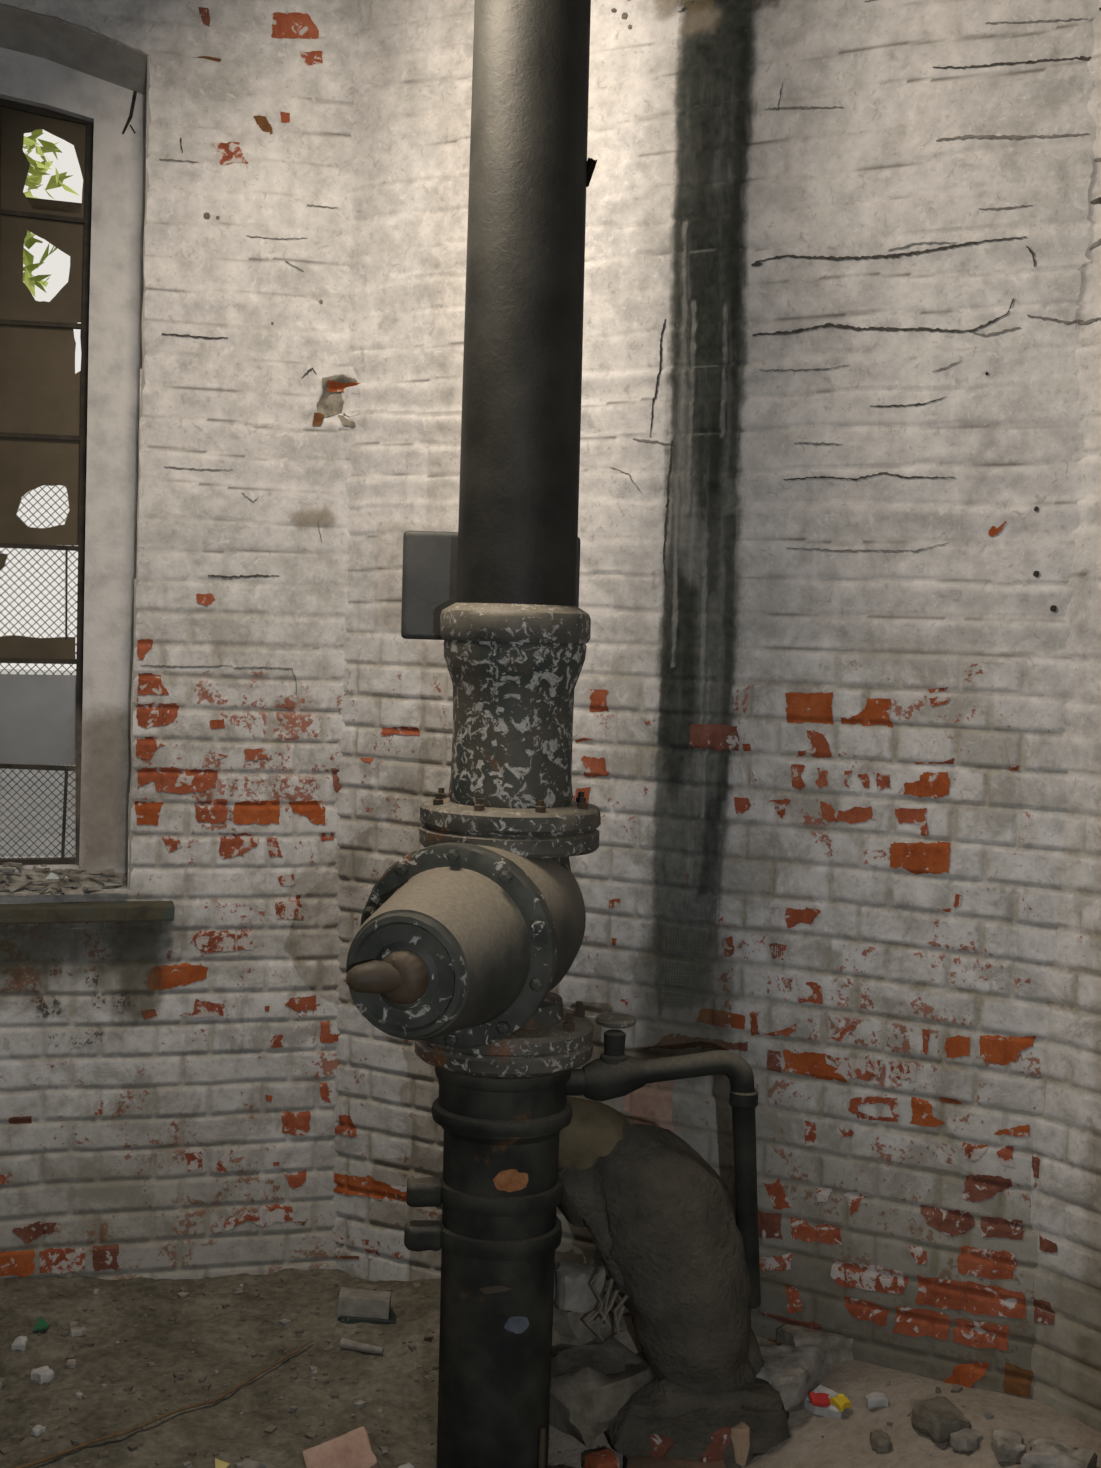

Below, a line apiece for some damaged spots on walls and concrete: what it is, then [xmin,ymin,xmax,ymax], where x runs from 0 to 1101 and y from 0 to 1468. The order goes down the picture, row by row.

crack [933,56,1092,69]
crack [985,8,1101,24]
crack [936,133,1101,162]
crack [751,205,1036,267]
spalling [312,374,360,427]
crack [752,298,1101,407]
water stain [671,296,697,667]
water stain [699,534,711,725]
peeling [134,639,342,859]
peeling [734,692,955,875]
peeling [643,1008,1036,1137]
peeling [758,1121,1057,1398]